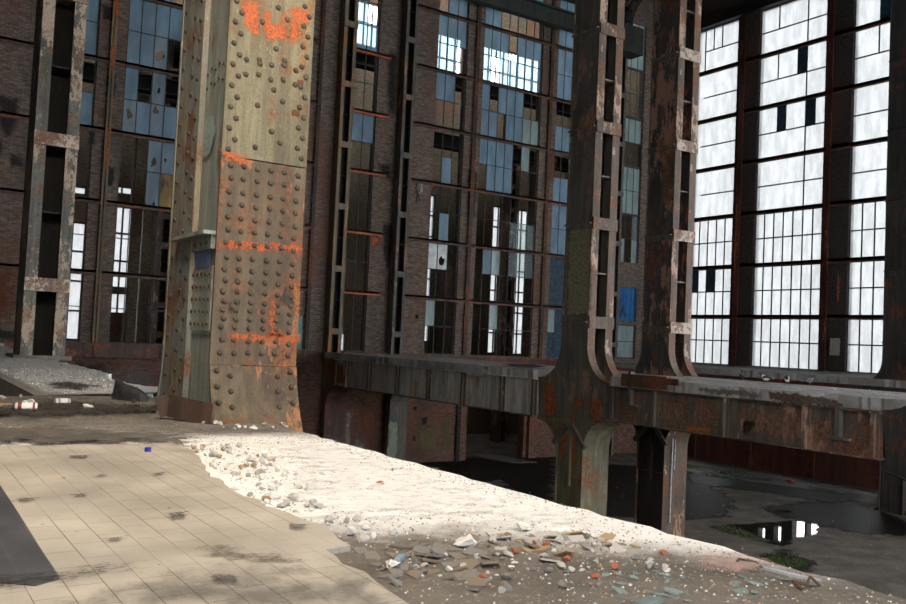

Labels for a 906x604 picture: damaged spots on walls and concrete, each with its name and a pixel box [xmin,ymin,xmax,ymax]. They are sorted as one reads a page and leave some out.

corrosion [288,275,302,319]